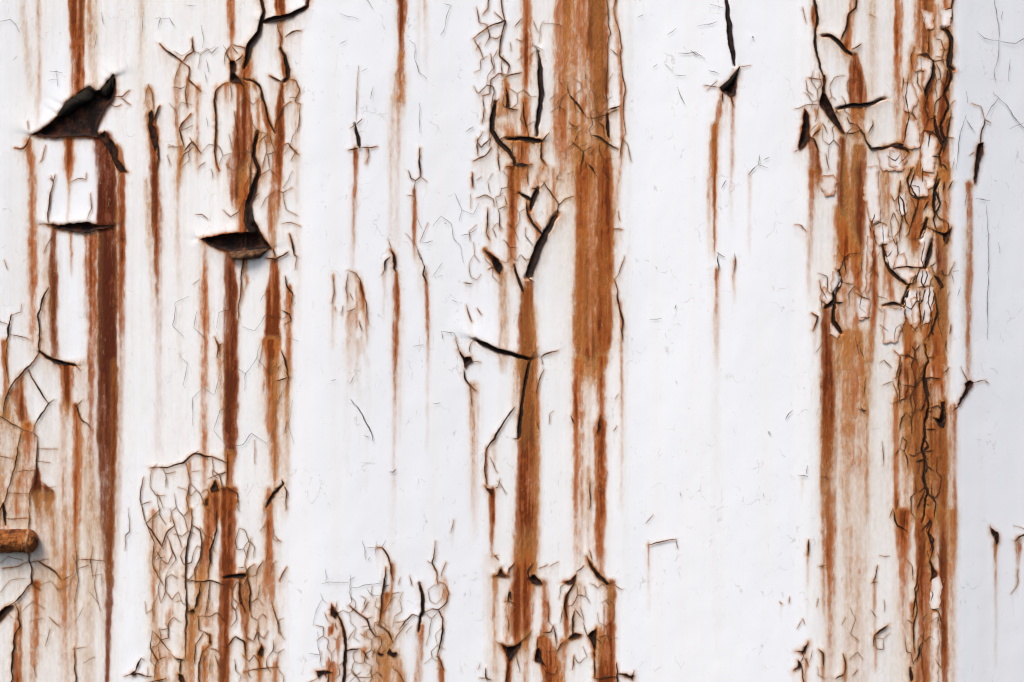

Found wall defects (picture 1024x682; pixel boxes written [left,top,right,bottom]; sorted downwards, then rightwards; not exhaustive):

corrosion [0,132,126,682]
peeling [14,74,130,173]
corrosion [187,0,297,682]
peeling [200,48,289,322]
crack [408,0,642,495]
corrosion [492,0,624,682]
peeling [533,550,609,678]
crack [654,0,754,104]
corrosion [820,0,895,677]
peeling [796,0,991,452]
corrosion [893,0,957,682]
peeling [910,514,943,682]